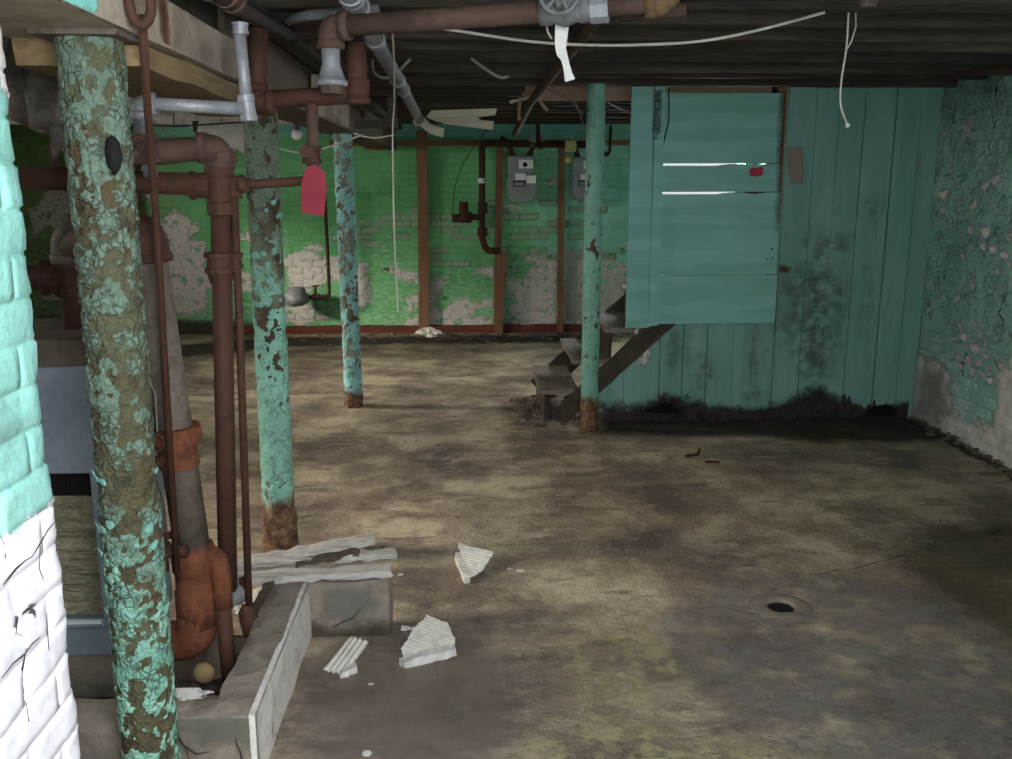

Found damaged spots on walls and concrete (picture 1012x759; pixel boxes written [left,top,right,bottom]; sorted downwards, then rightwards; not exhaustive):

peeling [160,209,212,315]
peeling [240,231,374,326]
peeling [351,194,585,325]
peeling [600,242,627,312]
peeling [966,222,1012,277]
peeling [911,321,1012,469]
crack [2,522,55,585]
peeling [95,520,115,533]
peeling [134,523,158,550]
crack [2,607,49,721]